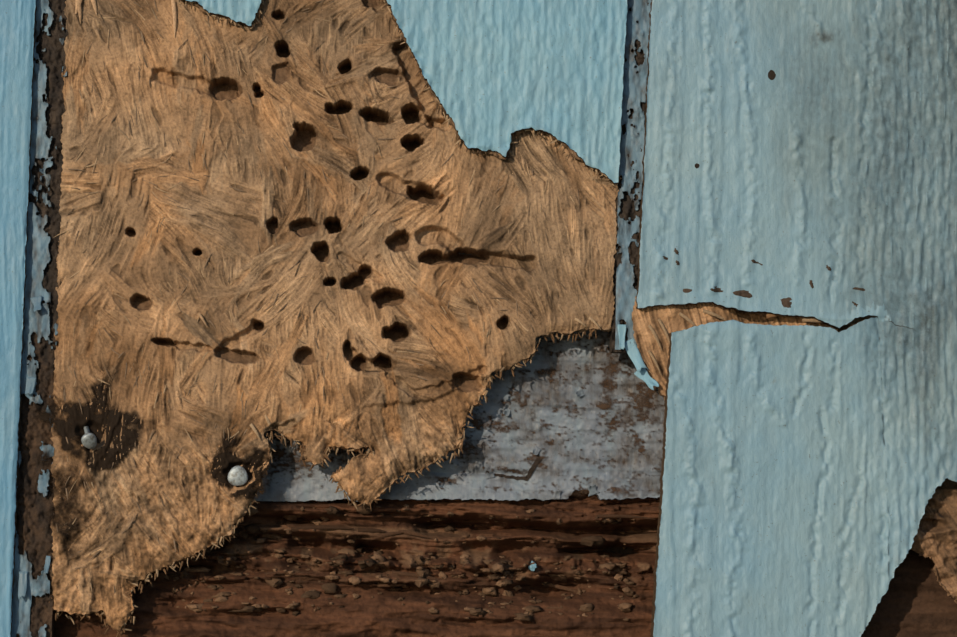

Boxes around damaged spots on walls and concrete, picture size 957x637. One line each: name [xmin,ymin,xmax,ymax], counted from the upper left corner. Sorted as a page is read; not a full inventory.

peeling [11,0,664,637]
crack [632,296,913,401]
spalling [861,479,957,637]